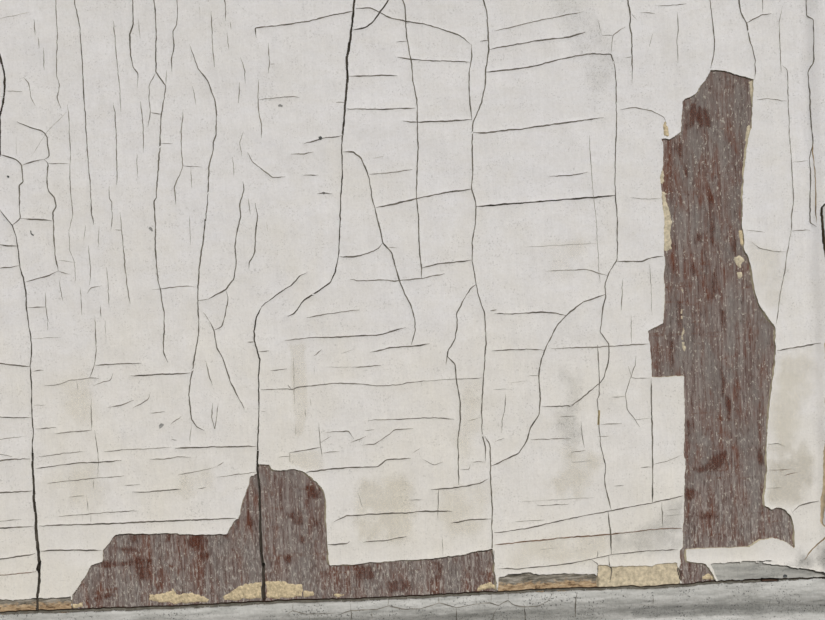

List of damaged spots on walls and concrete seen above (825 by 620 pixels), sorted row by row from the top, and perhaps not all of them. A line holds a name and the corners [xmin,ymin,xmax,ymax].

crack [129,0,140,87]
crack [708,1,716,65]
crack [238,44,296,137]
crack [45,0,138,387]
crack [135,0,268,435]
crack [249,0,684,576]
peeling [648,70,795,584]
crack [41,459,122,468]
crack [45,546,98,554]
crack [45,503,234,526]
peeling [0,464,680,615]
peeling [711,560,825,584]